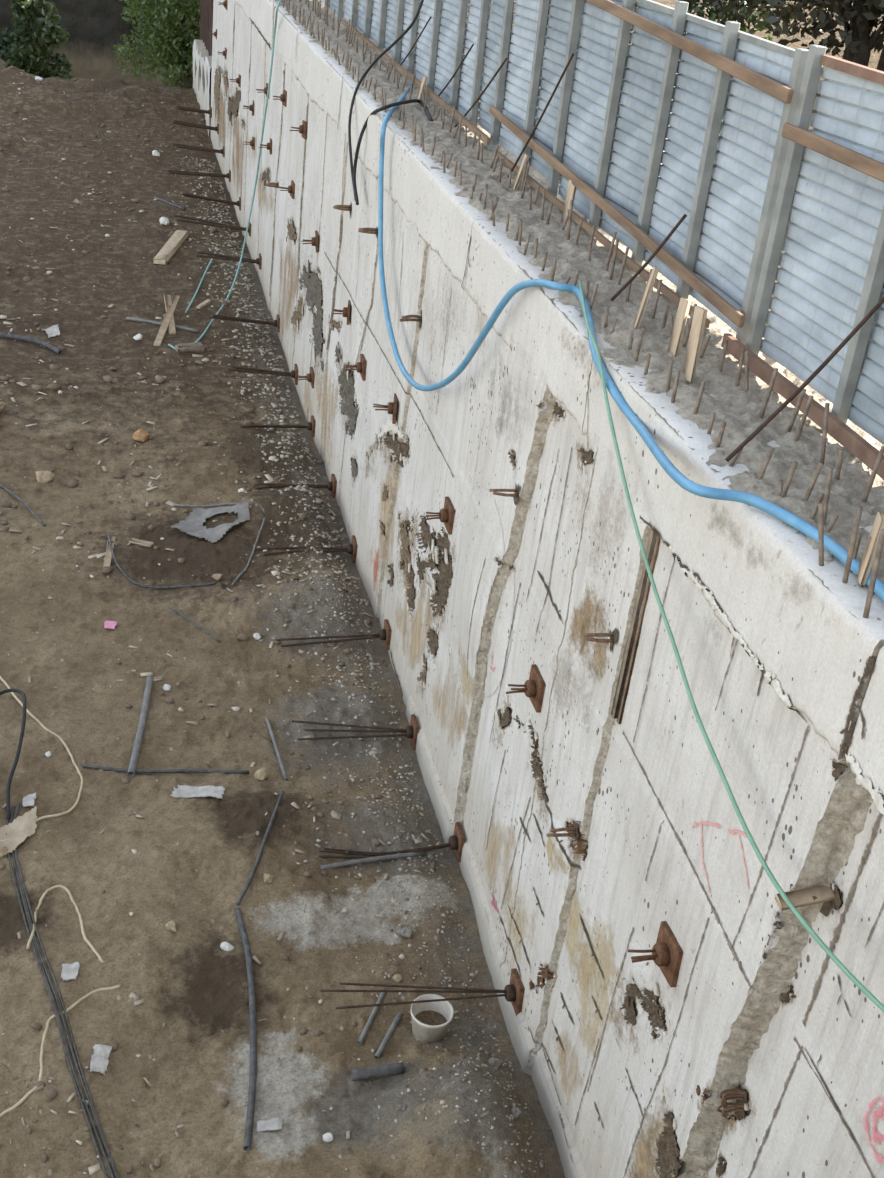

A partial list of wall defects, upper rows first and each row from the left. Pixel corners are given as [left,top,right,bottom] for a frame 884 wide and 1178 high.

spalling [286,217,297,245]
spalling [291,298,304,334]
spalling [379,511,453,692]
crack [640,516,807,723]
spalling [495,705,548,802]
crack [838,656,876,760]
spalling [529,964,556,995]